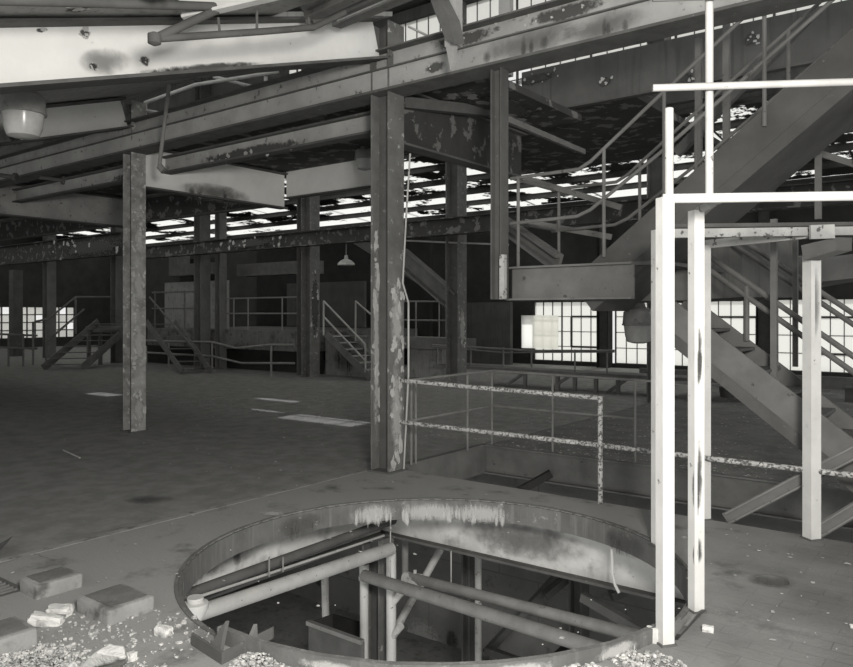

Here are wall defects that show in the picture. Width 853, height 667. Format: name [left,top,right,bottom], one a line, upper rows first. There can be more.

damp [190,187,233,201]
peeling [53,238,122,260]
peeling [220,235,282,250]
peeling [372,230,380,424]
peeling [389,278,405,470]
damp [355,507,391,525]
damp [402,505,554,552]